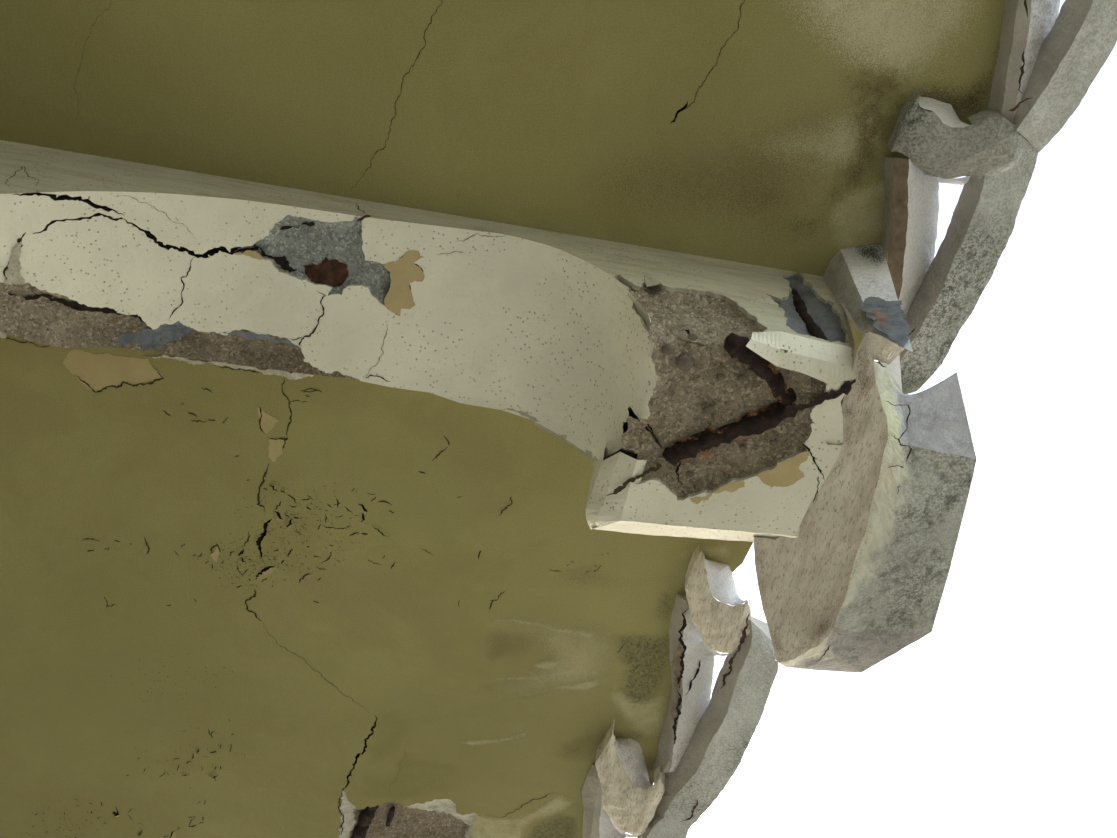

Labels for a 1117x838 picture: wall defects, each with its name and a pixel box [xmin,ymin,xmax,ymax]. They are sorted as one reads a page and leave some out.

crack [351,0,442,221]
crack [671,0,745,123]
crack [3,166,258,320]
spalling [0,282,356,397]
spalling [233,215,425,316]
spalling [617,273,826,504]
spalling [774,276,846,343]
spalling [861,297,911,348]
crack [257,464,272,557]
crack [245,590,378,834]
crack [672,608,749,744]
spalling [338,791,483,838]